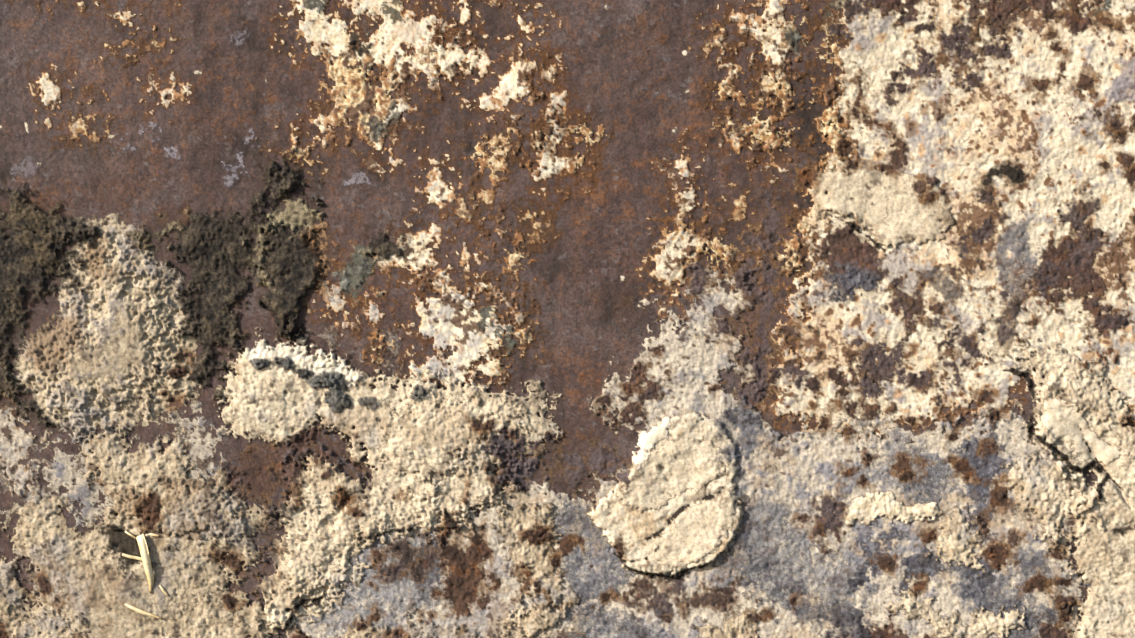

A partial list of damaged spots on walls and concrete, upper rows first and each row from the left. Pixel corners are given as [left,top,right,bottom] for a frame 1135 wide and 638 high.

rust [827,0,1135,190]
peeling [244,0,612,388]
peeling [636,0,1135,465]
peeling [0,391,58,498]
peeling [443,411,535,486]
rust [705,161,1135,570]
crack [1003,358,1123,503]
spalling [96,524,152,577]
rust [368,482,549,621]
flaking render [496,601,563,638]
rust [518,524,584,567]
rust [1021,573,1079,638]